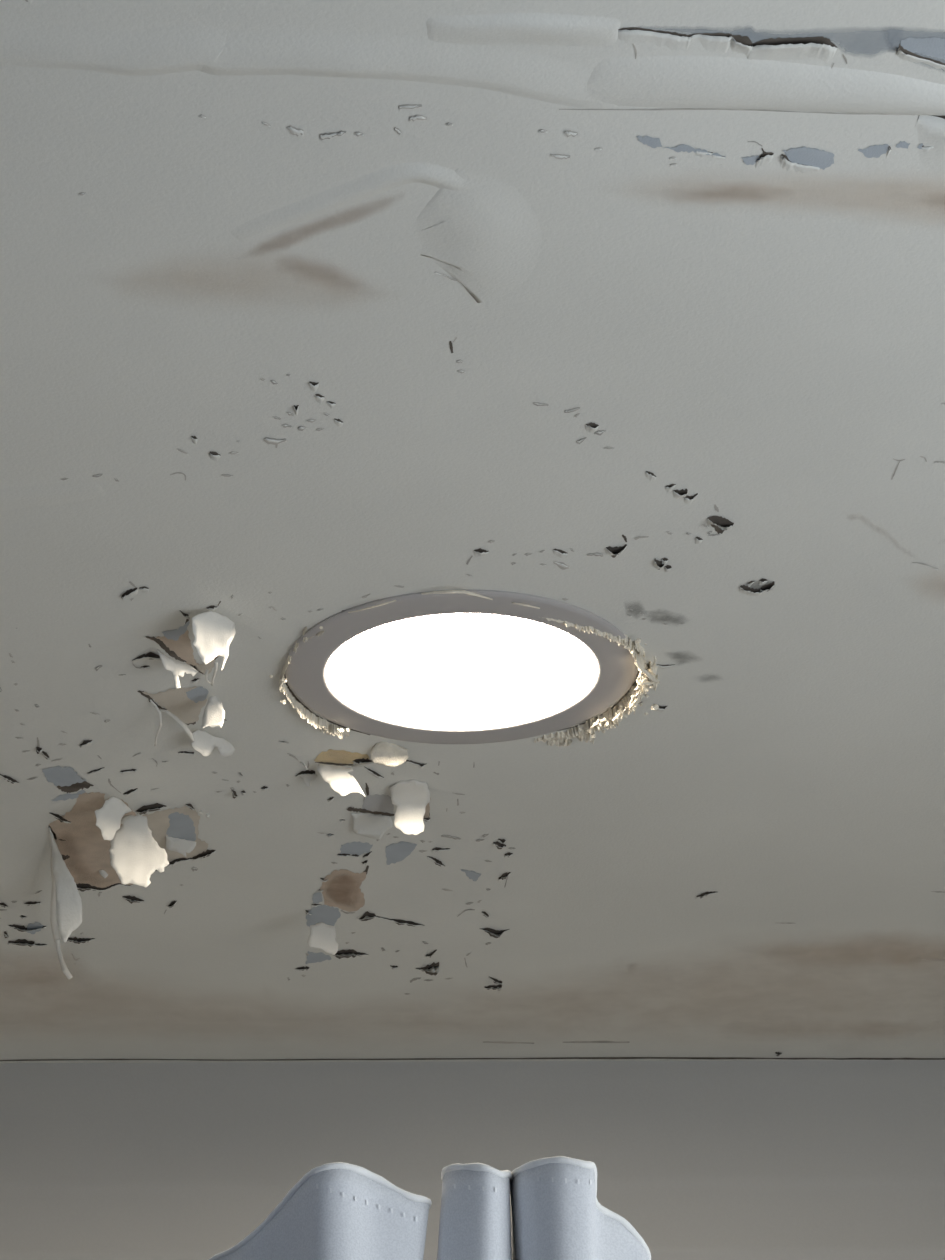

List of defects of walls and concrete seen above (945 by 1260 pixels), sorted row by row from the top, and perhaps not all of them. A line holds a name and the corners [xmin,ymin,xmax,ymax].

peeling [618,27,945,72]
peeling [637,136,726,167]
peeling [742,141,834,174]
peeling [858,141,934,158]
peeling [0,595,242,979]
peeling [211,772,268,799]
peeling [279,741,461,995]
peeling [457,834,516,945]
peeling [484,977,502,991]